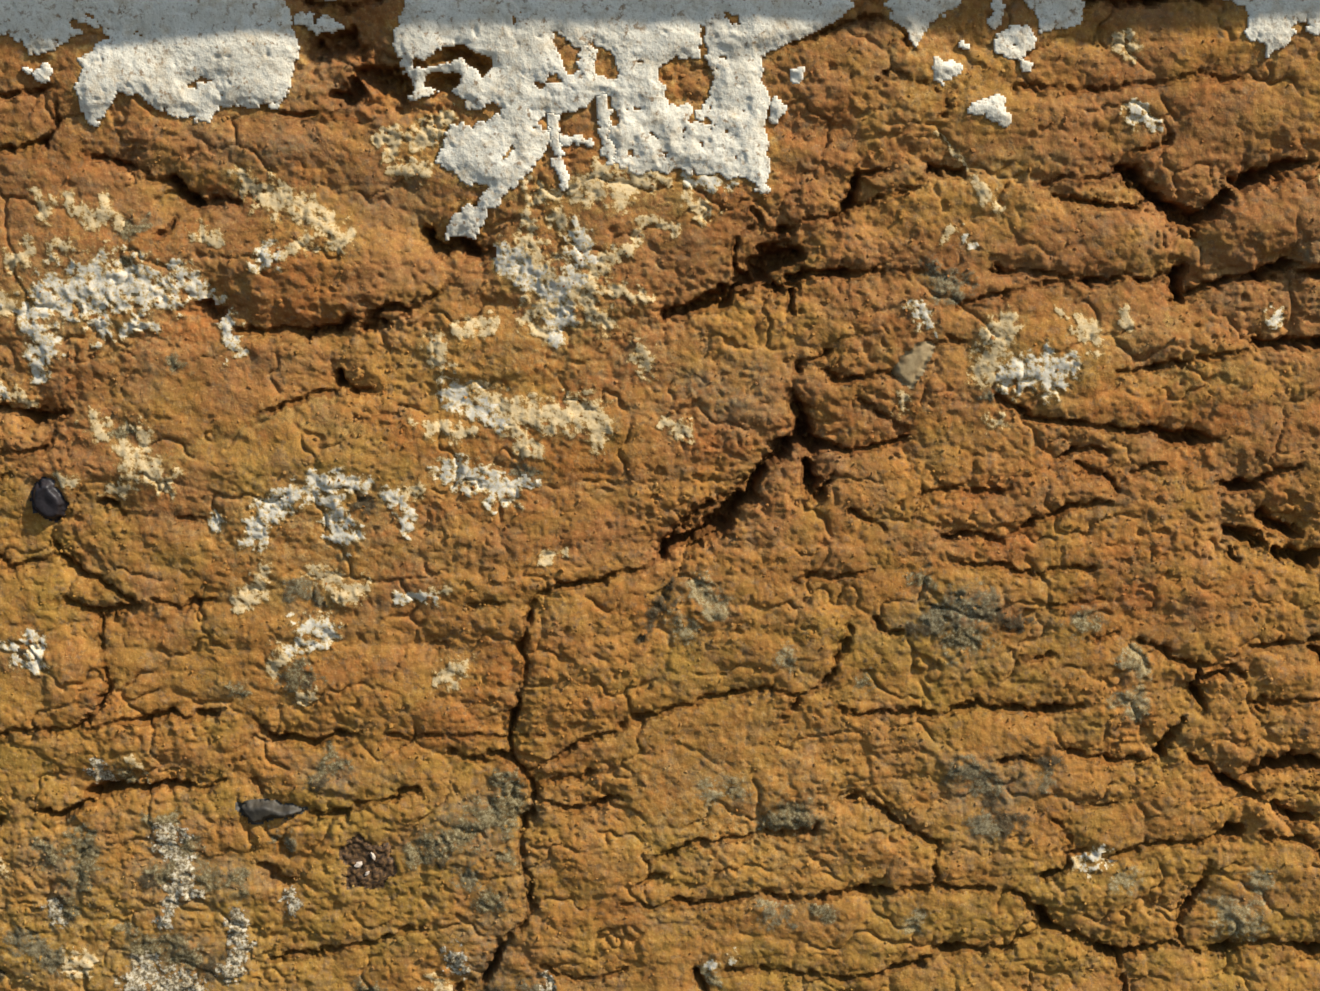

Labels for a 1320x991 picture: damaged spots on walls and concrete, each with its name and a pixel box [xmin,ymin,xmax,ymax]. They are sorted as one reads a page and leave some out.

peeling [22,62,53,84]
crack [0,81,243,240]
peeling [294,0,345,36]
peeling [370,103,459,186]
peeling [932,40,970,86]
peeling [967,94,1012,128]
peeling [246,171,358,274]
crack [231,223,497,344]
crack [657,161,966,323]
crack [925,132,1320,346]
crack [0,348,1087,991]
crack [617,389,1320,991]